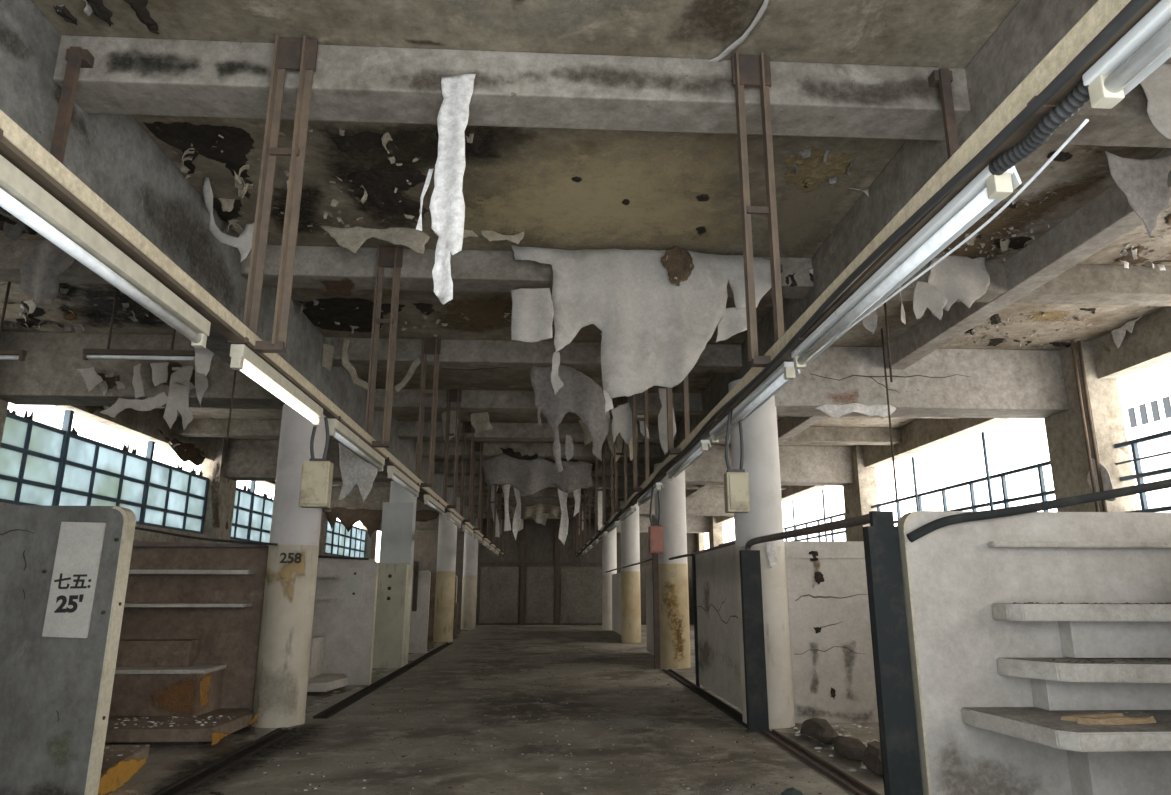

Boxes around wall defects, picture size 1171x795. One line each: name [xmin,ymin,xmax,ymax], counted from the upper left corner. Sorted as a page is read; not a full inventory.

leakage [111,51,197,75]
leakage [218,62,266,75]
leakage [412,73,451,90]
leakage [568,70,732,90]
leakage [804,79,940,104]
peeling [1140,63,1171,140]
spalling [143,122,260,263]
peeling [899,173,1057,325]
peeling [1090,151,1171,271]
peeling [297,74,797,545]
peeling [76,348,214,466]
corrosion [663,584,684,656]